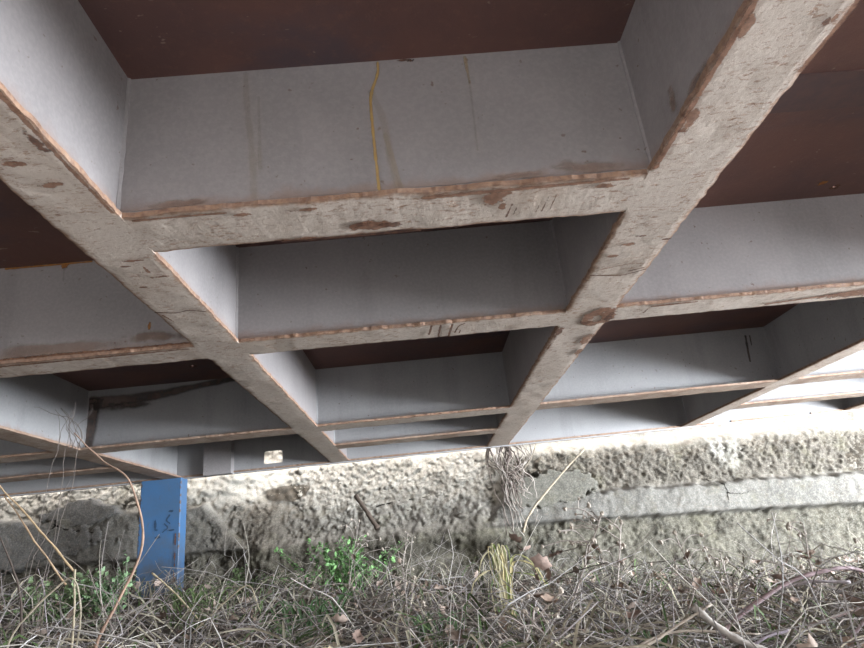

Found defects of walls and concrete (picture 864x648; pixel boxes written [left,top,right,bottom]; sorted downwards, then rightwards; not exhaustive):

corrosion [369,62,380,190]